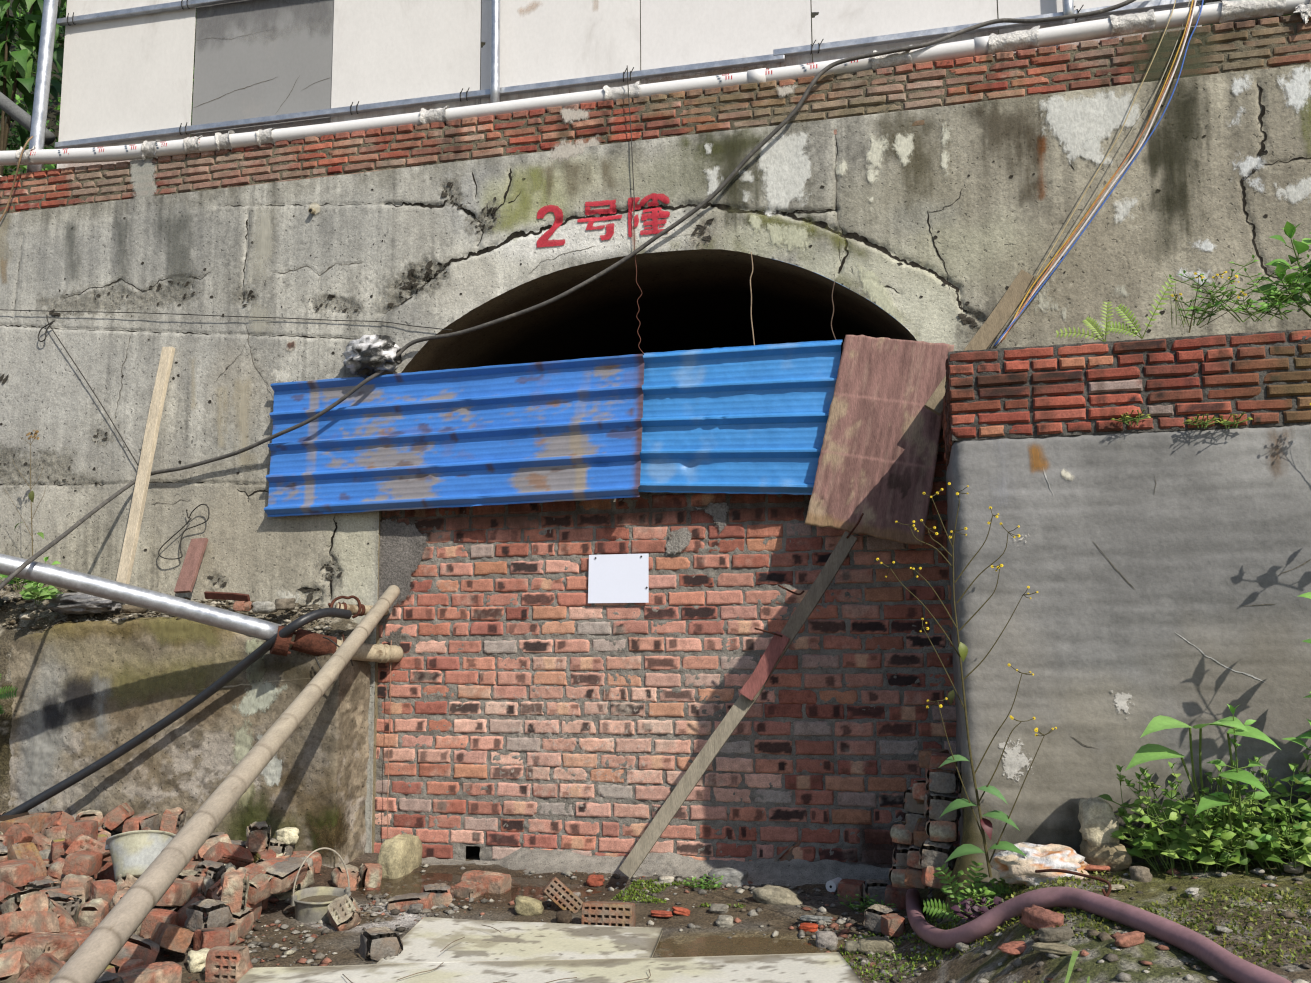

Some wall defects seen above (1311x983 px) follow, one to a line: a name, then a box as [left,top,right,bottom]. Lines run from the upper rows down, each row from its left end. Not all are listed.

peeling [1039,91,1140,165]
peeling [1232,75,1252,123]
peeling [1278,66,1311,111]
crack [382,139,969,314]
peeling [705,144,722,195]
peeling [739,132,811,250]
peeling [1233,156,1311,203]
crack [1241,83,1311,282]
crack [66,273,208,298]
peeling [859,267,902,324]
crack [325,517,338,599]
water stain [29,680,106,797]